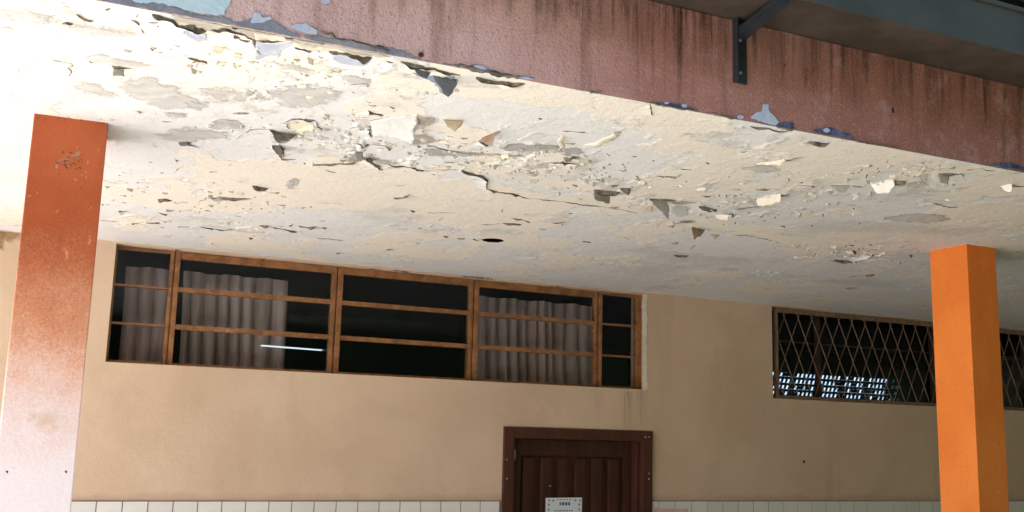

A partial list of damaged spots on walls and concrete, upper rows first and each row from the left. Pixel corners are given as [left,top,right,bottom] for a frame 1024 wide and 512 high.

crack [137,111,238,172]
peeling [69,0,1024,261]
crack [100,156,635,254]